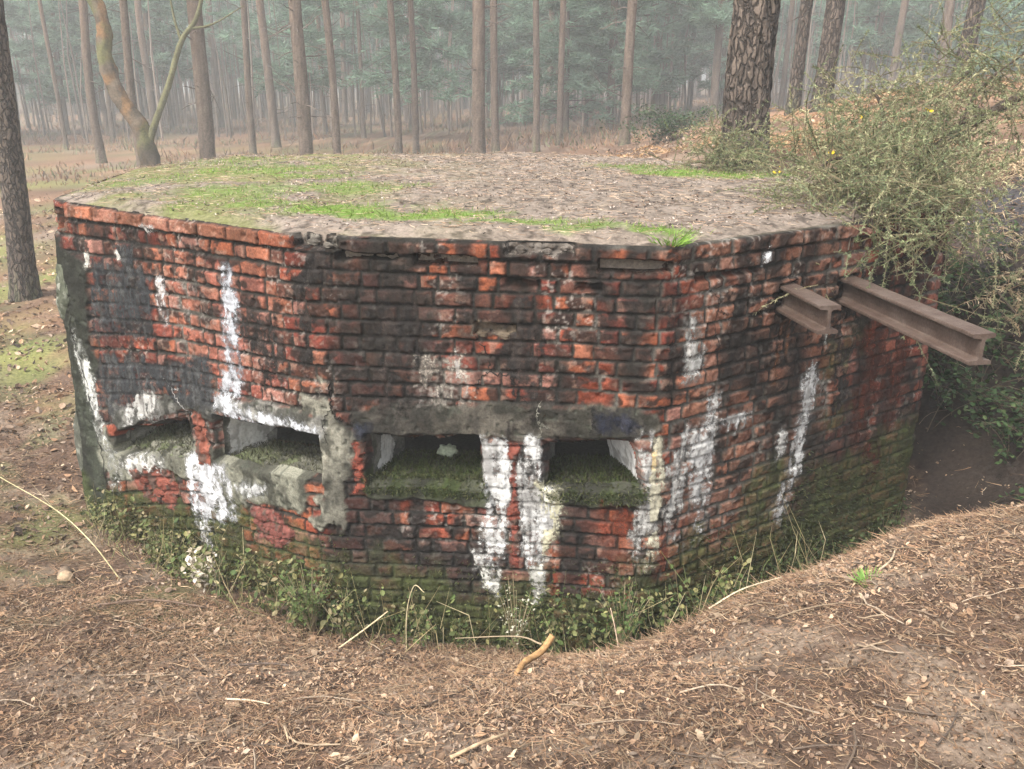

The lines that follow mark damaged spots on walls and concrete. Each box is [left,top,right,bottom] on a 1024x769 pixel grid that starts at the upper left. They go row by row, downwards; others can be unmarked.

leakage [74,328,163,491]
spalling [129,465,180,510]
spalling [191,411,211,466]
leakage [218,263,286,408]
spalling [250,504,295,549]
leakage [471,295,563,604]
leakage [627,391,753,573]
leakage [771,269,866,520]